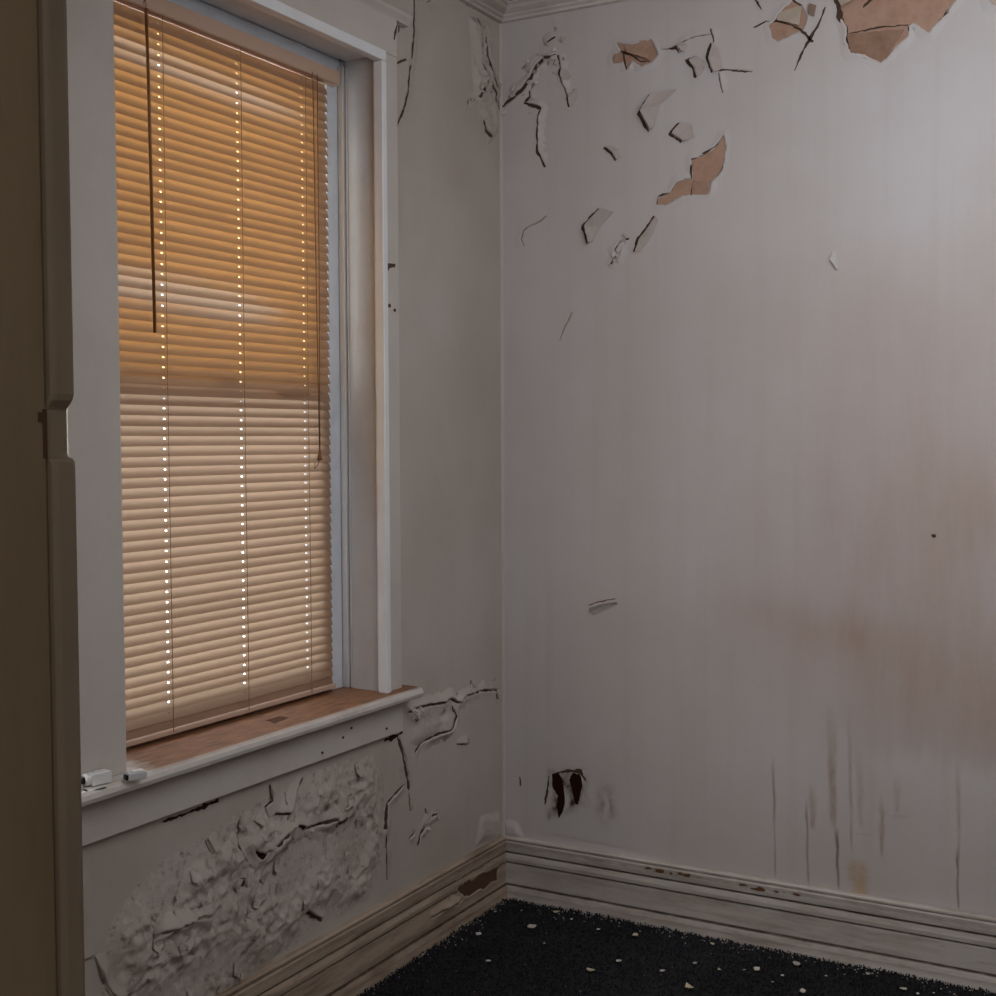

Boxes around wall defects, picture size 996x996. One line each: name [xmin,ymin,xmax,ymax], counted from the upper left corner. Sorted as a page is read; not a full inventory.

crack [397,0,433,132]
peeling [606,33,722,78]
peeling [754,0,967,73]
peeling [637,89,677,132]
peeling [668,122,694,143]
peeling [581,208,613,244]
peeling [633,129,732,252]
damp [674,198,996,916]
crack [384,677,502,880]
peeling [430,861,501,927]